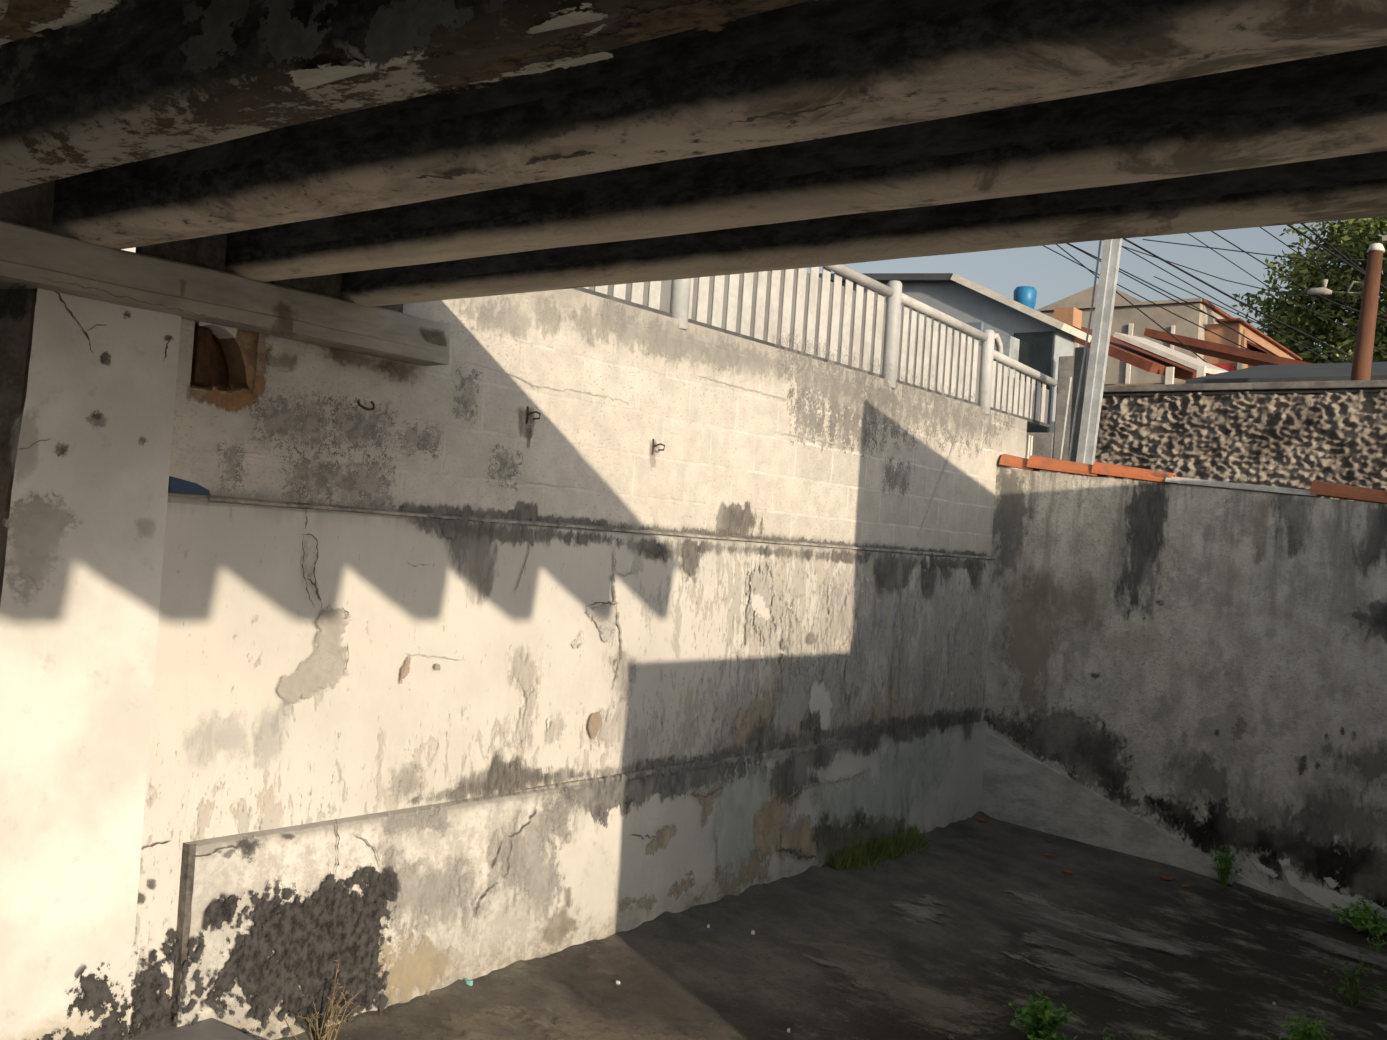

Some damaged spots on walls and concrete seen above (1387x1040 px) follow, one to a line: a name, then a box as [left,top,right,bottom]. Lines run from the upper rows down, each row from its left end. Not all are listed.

spalling [0,0,120,47]
peeling [177,0,512,90]
spalling [422,0,831,95]
crack [42,277,276,361]
leakage [778,334,1013,495]
crack [302,509,322,607]
leakage [251,391,1033,599]
leakage [1115,473,1169,619]
peeling [737,562,871,740]
crack [475,809,537,916]
leakage [37,707,1387,1040]
peeling [1252,858,1387,923]